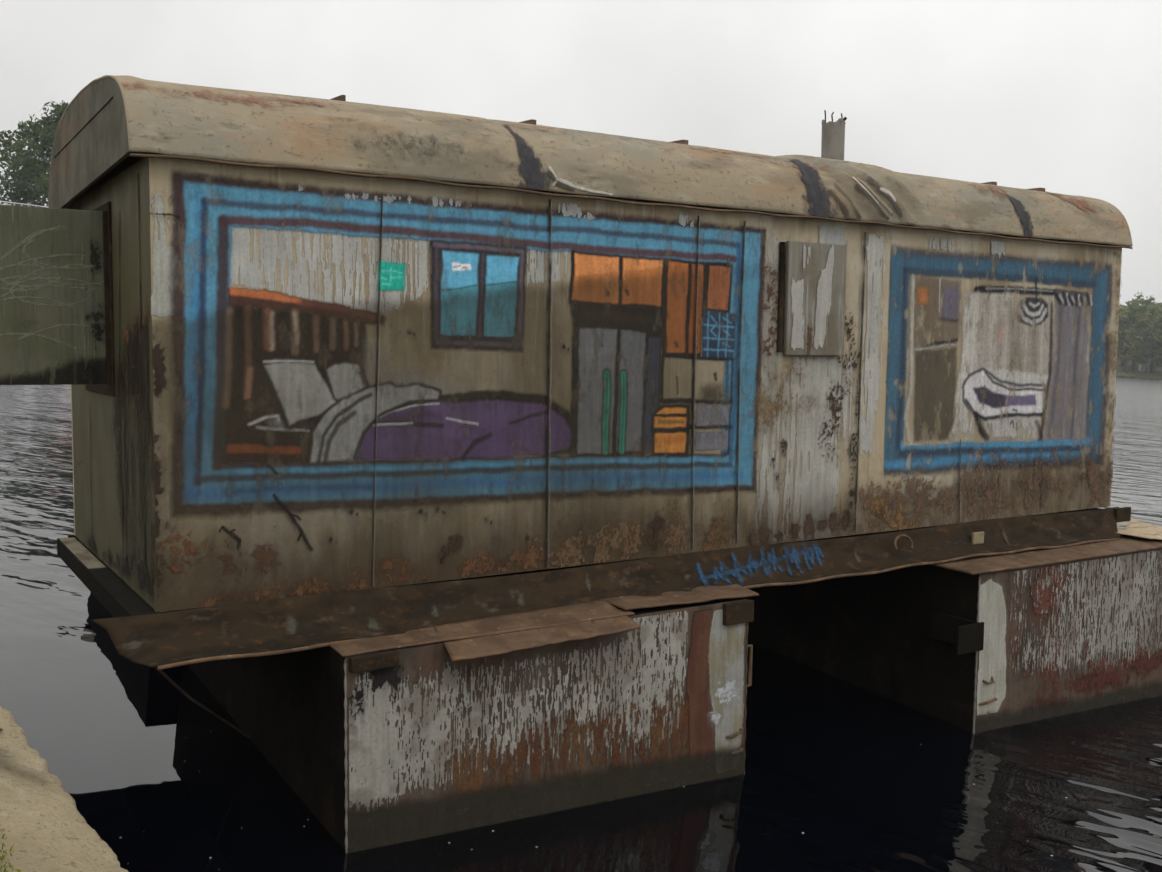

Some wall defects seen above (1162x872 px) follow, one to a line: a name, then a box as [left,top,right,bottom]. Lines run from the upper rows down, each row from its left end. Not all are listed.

peeling [754,232,885,543]
peeling [349,611,689,811]
corrosion [439,609,715,795]
peeling [708,609,745,752]
peeling [977,549,1162,716]
corrosion [1009,565,1162,710]